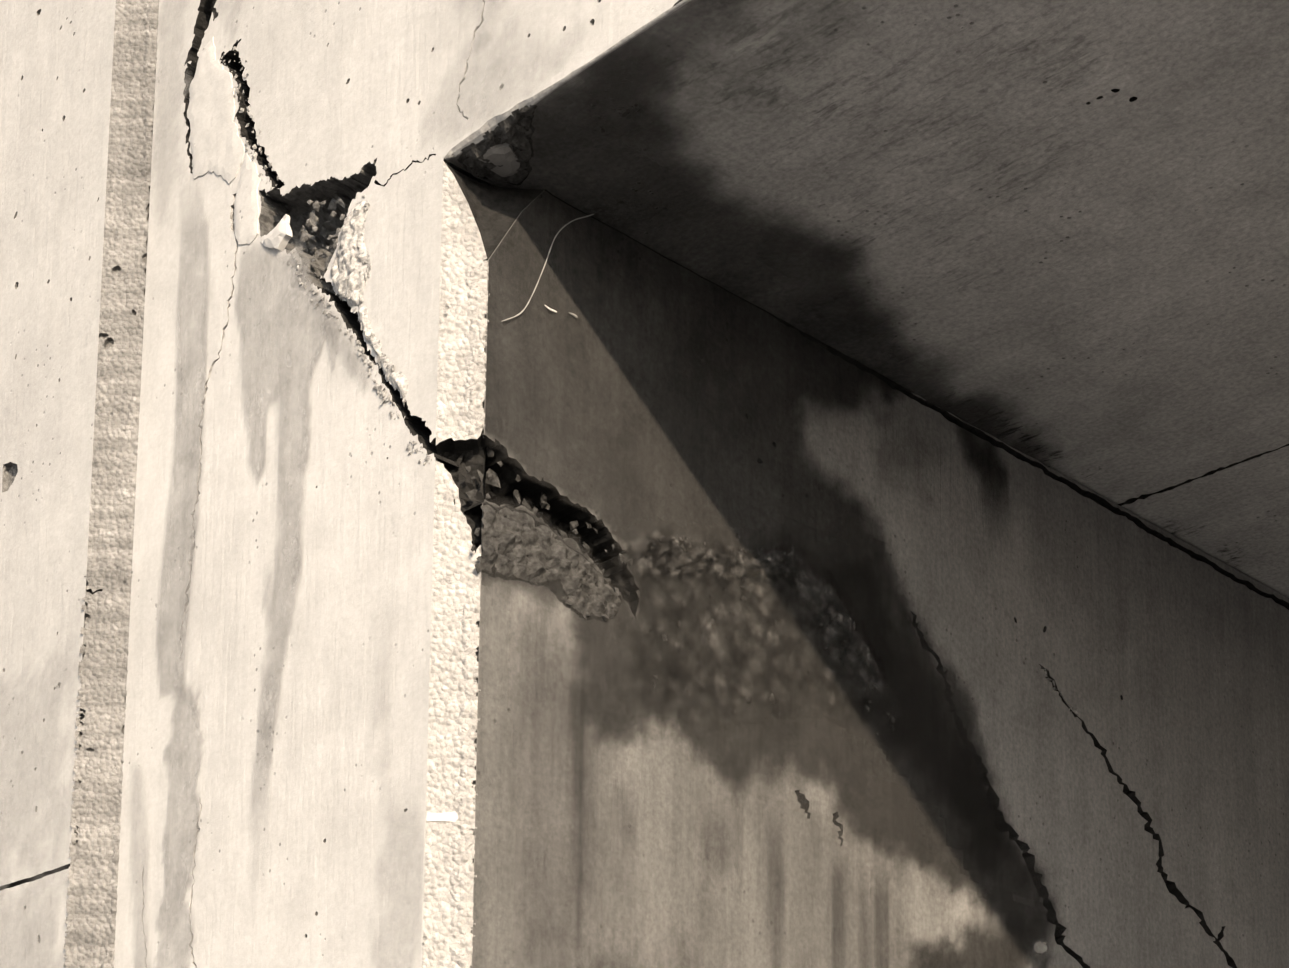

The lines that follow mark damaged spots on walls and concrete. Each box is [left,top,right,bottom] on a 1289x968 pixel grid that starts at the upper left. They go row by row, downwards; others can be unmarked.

leakage [262,250,329,376]
crack [180,0,639,655]
leakage [450,47,1055,968]
leakage [159,508,198,734]
leakage [262,679,277,741]
crack [911,612,943,670]
crack [984,766,1090,968]
crack [1039,664,1237,968]